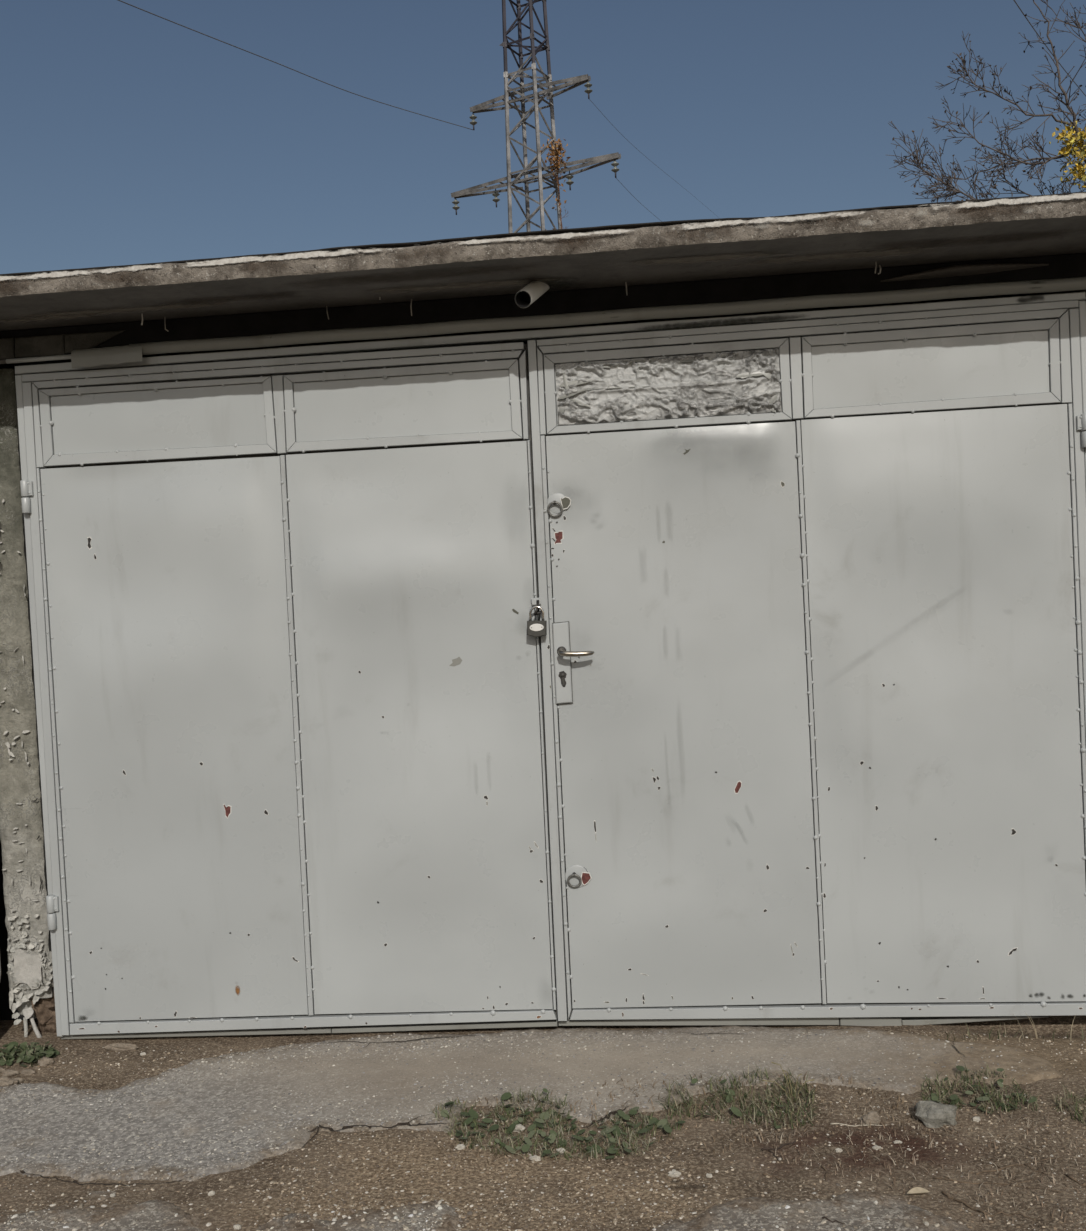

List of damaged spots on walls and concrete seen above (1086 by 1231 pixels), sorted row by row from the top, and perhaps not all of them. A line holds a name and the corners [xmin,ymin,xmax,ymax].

spalling [7,900,57,1038]